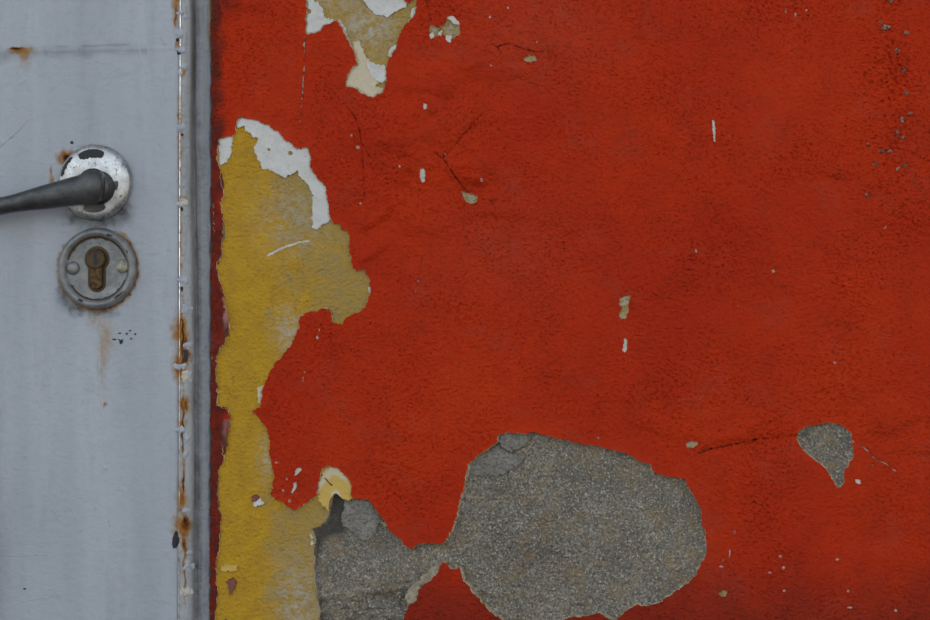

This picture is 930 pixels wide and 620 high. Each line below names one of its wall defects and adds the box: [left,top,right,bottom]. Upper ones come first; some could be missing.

peeling [305,0,417,97]
peeling [429,16,460,42]
rust [173,318,190,378]
peeling [212,116,707,620]
rust [180,398,188,453]
crack [698,435,797,454]
spalling [796,422,861,488]
rust [175,471,190,588]